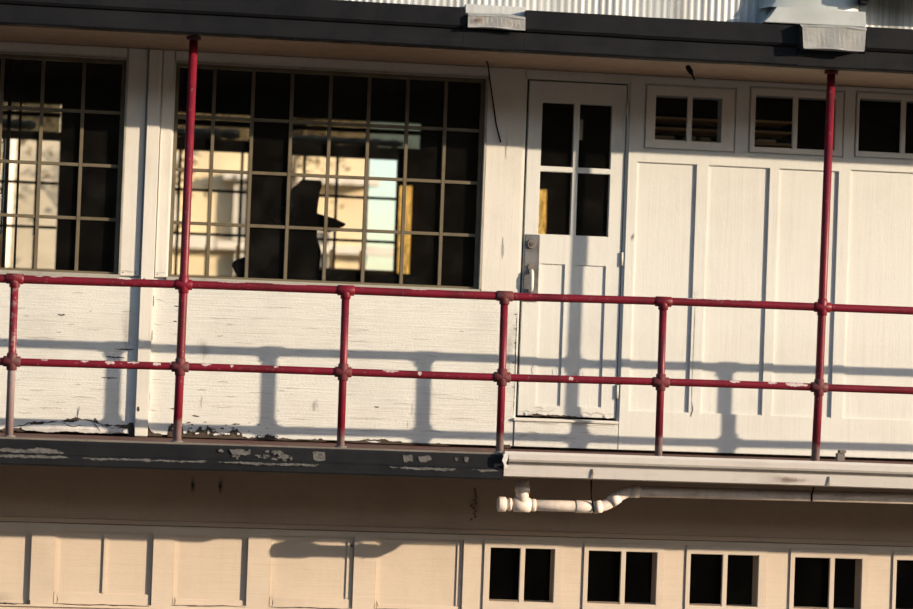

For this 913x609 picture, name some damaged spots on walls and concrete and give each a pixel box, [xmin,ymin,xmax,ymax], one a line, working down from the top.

peeling [0,406,134,436]
peeling [0,447,69,459]
peeling [148,422,326,467]
peeling [346,439,510,472]